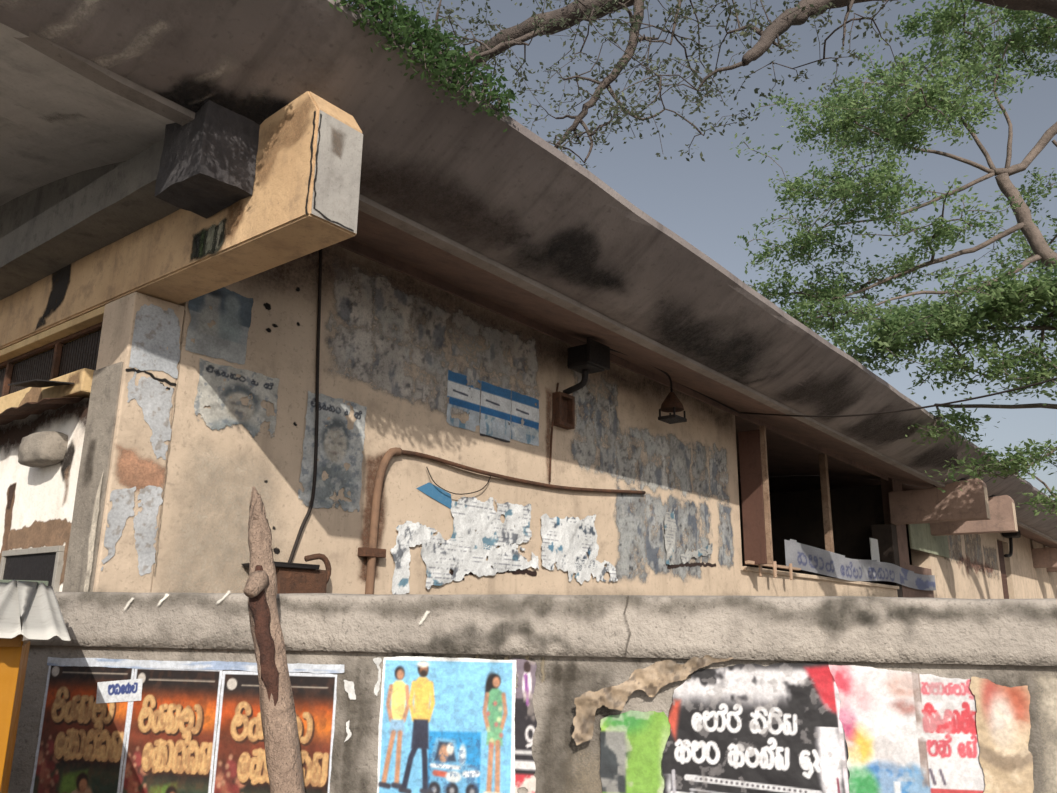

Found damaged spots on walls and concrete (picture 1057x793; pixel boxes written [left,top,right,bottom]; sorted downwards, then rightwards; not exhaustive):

damp [158,61,309,179]
crack [305,111,354,231]
damp [360,166,624,289]
damp [35,264,71,330]
crack [125,368,176,390]
peeling [127,304,180,460]
damp [658,308,762,384]
peeling [101,485,163,576]